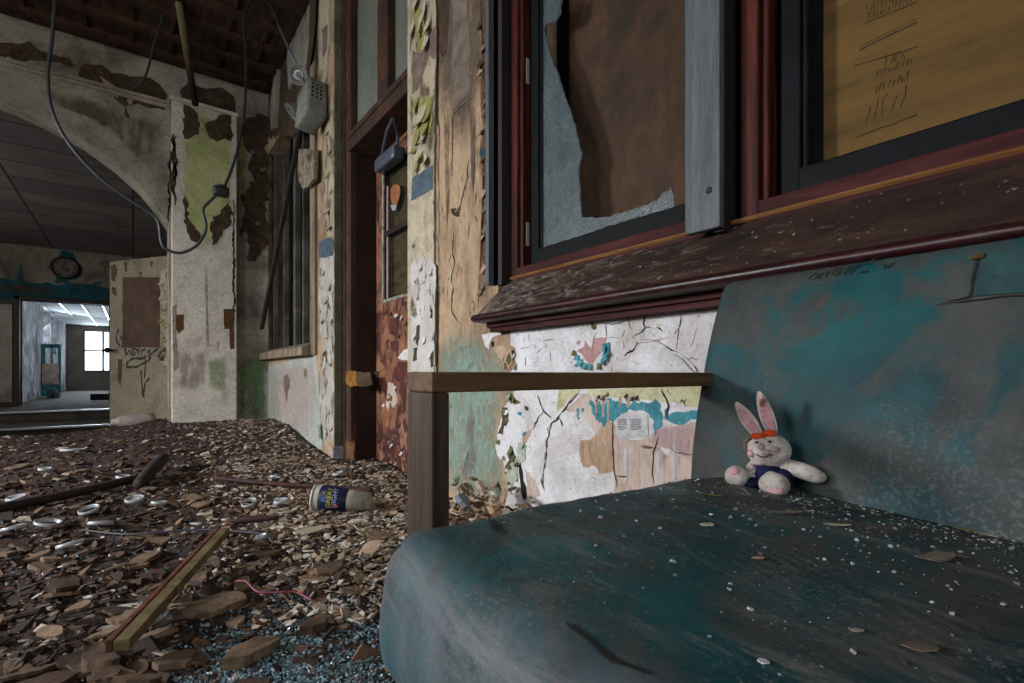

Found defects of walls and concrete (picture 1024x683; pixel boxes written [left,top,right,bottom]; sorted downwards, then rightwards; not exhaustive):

crack [167,134,180,224]
peeling [182,0,330,262]
peeling [148,99,408,631]
peeling [381,243,437,409]
peeling [481,308,718,373]
crack [592,316,699,373]
crack [481,391,578,500]
peeling [496,386,701,515]
crack [612,389,693,483]